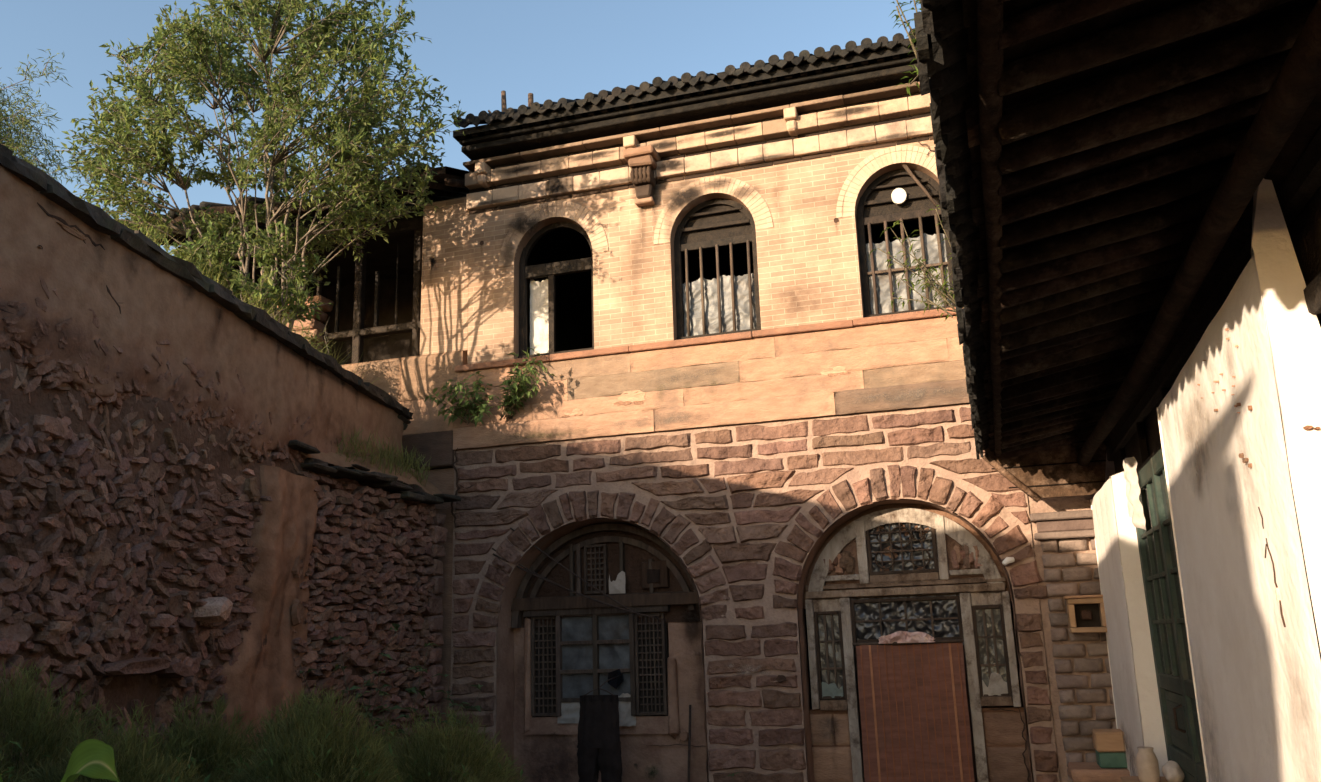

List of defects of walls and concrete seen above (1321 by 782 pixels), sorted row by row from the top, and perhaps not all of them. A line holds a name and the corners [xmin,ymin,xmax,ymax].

crack [37,202,105,250]
crack [106,285,121,314]
crack [1258,507,1286,627]